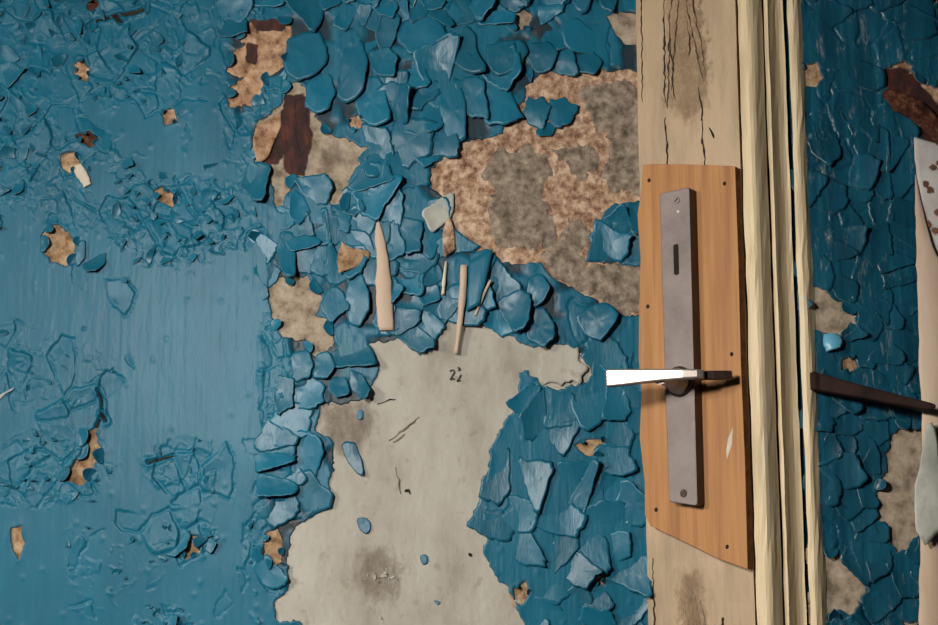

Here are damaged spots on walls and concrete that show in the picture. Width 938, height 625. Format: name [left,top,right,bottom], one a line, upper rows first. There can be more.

peeling [0,0,147,169]
flaking render [802,62,822,87]
corrosion [885,67,938,117]
flaking render [889,62,938,105]
flaking render [61,132,99,188]
corrosion [262,94,313,176]
flaking render [40,223,107,271]
flaking render [107,0,653,625]
peeling [797,105,938,625]
crack [90,390,107,435]
crack [148,456,174,464]